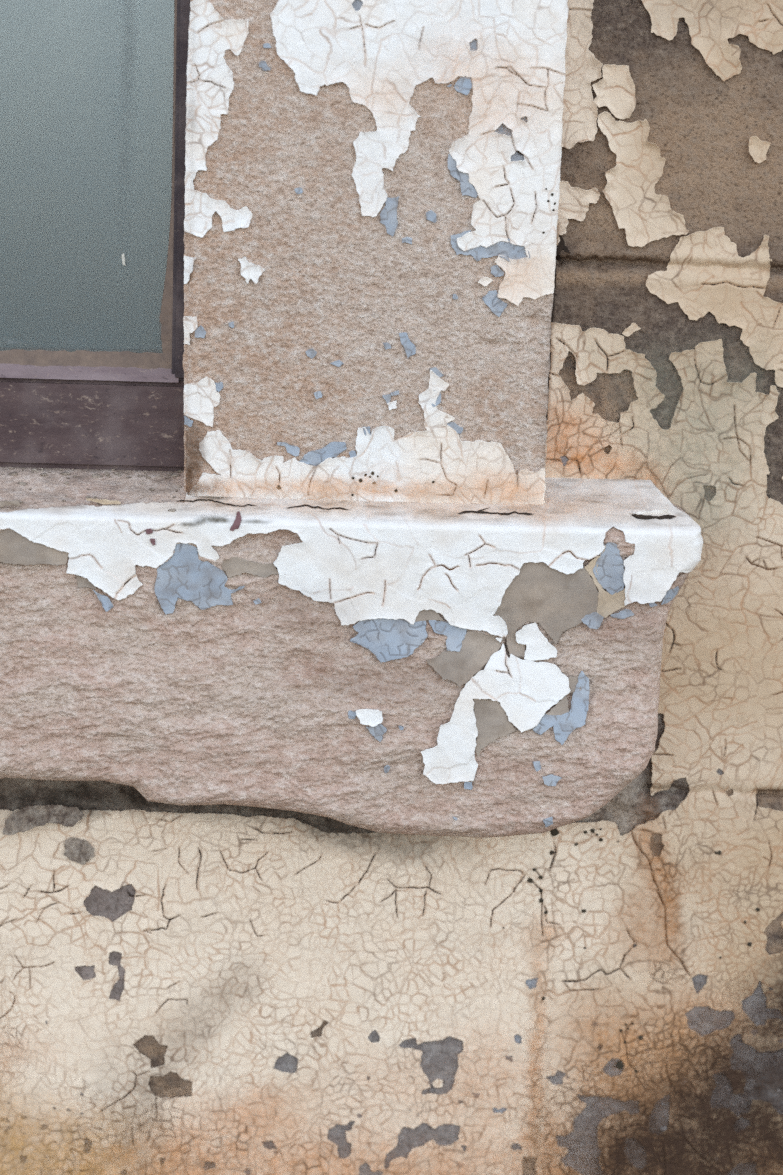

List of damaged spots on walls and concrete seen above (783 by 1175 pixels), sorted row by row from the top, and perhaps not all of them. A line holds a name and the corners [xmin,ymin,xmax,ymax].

peeling [0,0,783,790]
crack [179,499,257,507]
crack [276,467,378,558]
crack [632,512,676,520]
peeling [83,884,136,921]
crack [127,828,292,933]
crack [328,855,440,918]
peeling [108,951,125,1001]
peeling [132,1035,192,1098]
peeling [399,1036,480,1104]
leakage [599,981,783,1175]
peeling [358,1109,467,1175]